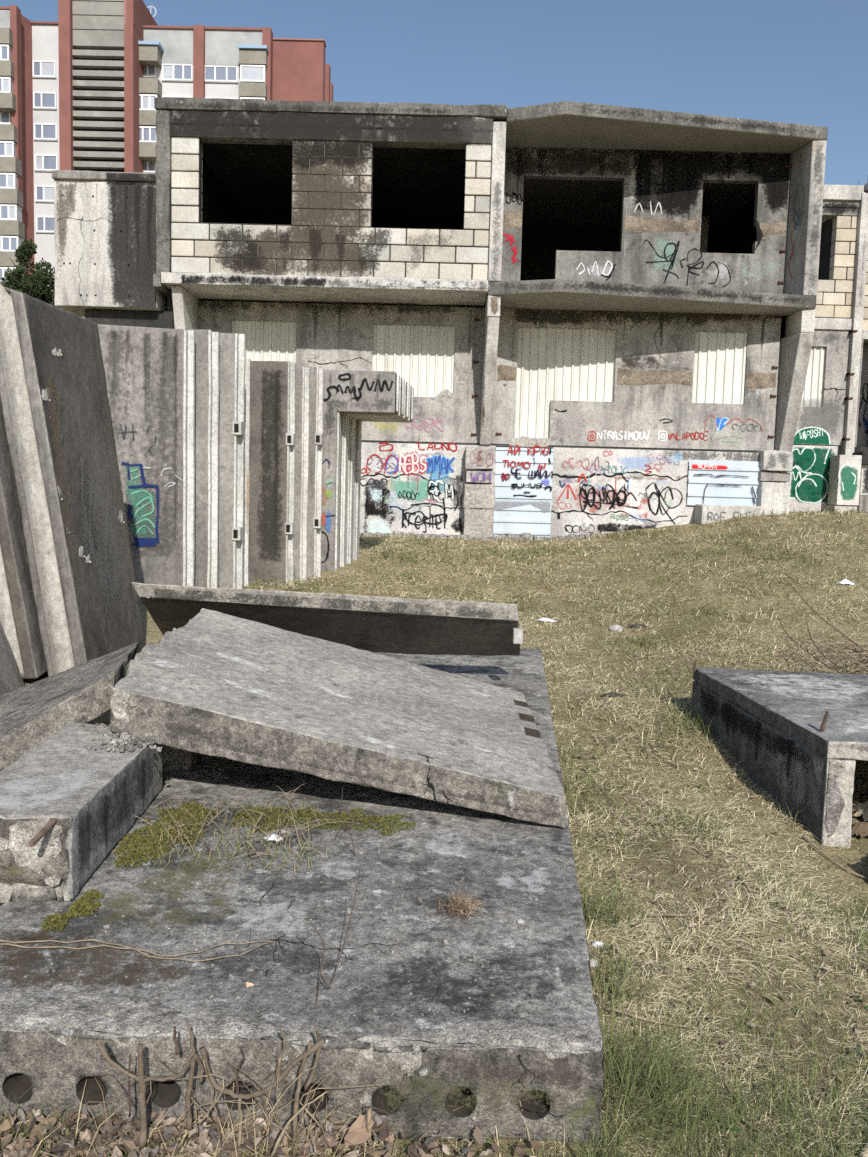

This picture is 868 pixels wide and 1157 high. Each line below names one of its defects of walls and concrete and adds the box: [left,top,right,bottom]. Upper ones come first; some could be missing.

water stain [56,182,89,293]
water stain [101,186,153,253]
crack [418,753,453,804]
spalling [0,817,62,887]